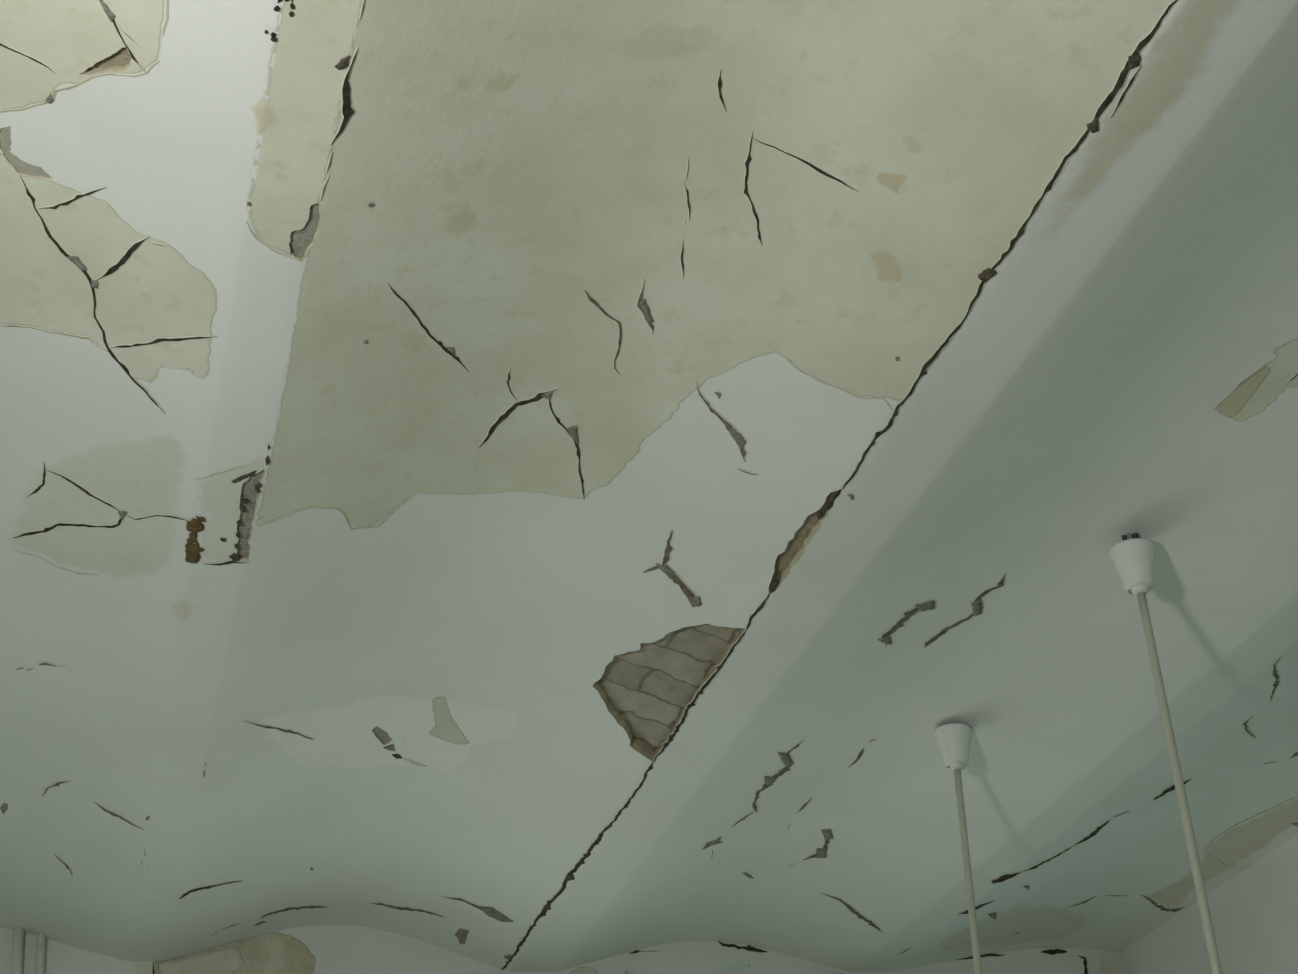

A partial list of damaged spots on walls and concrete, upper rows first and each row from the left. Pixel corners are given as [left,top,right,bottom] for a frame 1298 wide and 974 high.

crack [320,0,365,201]
peeling [0,0,1173,594]
crack [743,132,860,246]
crack [841,0,1179,489]
crack [478,368,585,500]
peeling [1212,338,1298,422]
rust [185,516,206,564]
crack [643,531,702,607]
crack [878,574,1006,648]
flaking render [593,624,745,762]
crack [371,594,771,970]
flaking render [133,932,316,974]